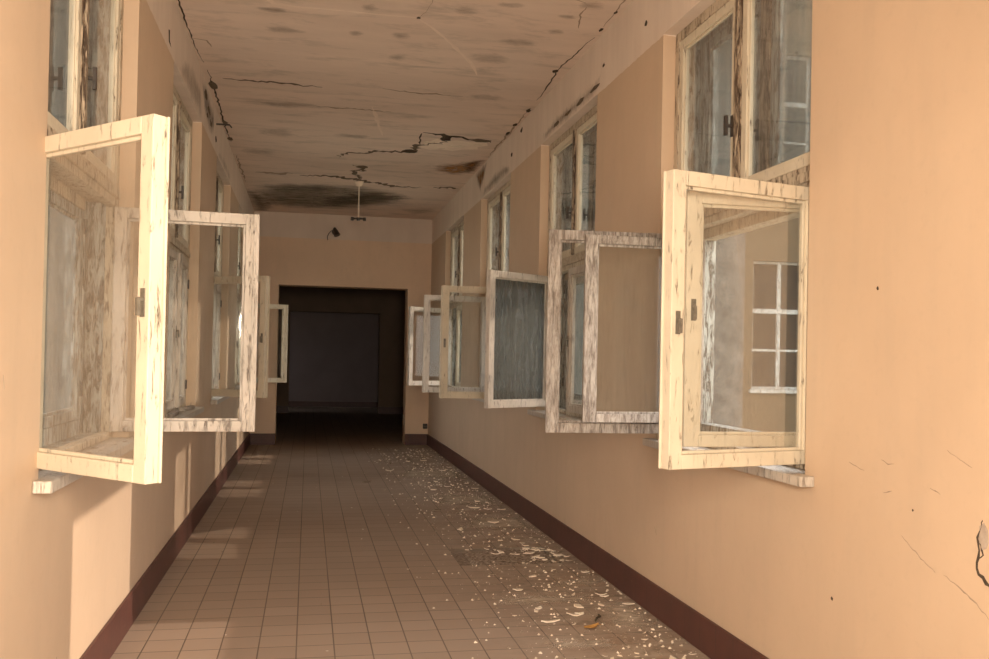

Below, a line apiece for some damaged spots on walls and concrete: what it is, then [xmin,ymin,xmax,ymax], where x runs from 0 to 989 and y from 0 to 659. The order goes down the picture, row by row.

crack [178,0,626,189]
damp [258,186,395,210]